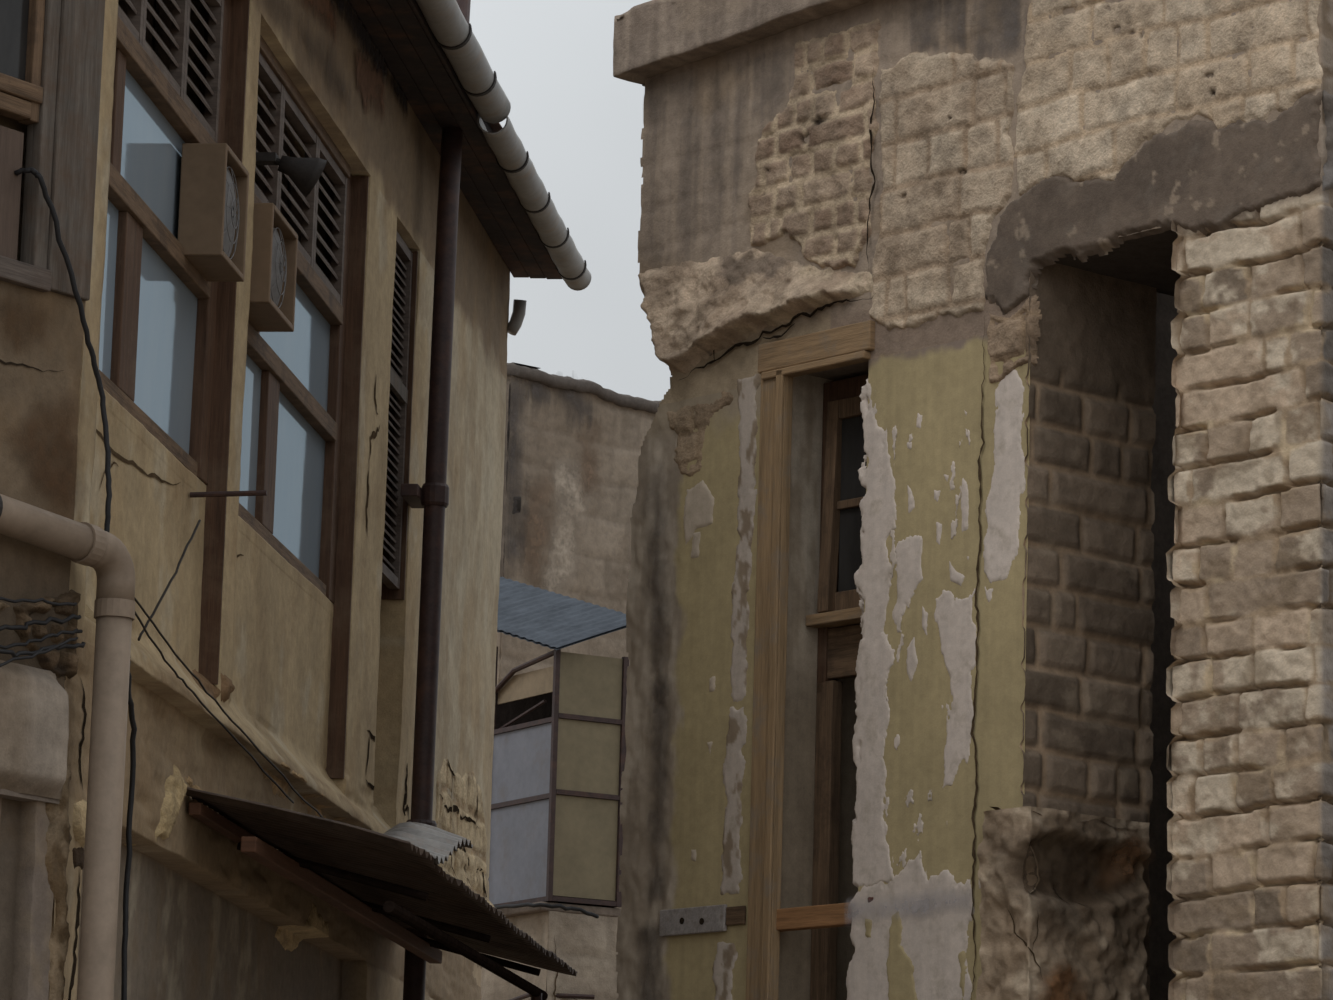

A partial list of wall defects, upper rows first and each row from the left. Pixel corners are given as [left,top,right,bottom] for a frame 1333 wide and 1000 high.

crack [680,67,876,380]
crack [0,359,64,372]
crack [96,429,179,491]
flaking render [748,0,1323,1000]
peeling [667,374,761,895]
flaking render [435,758,494,907]
peeling [712,942,738,1000]